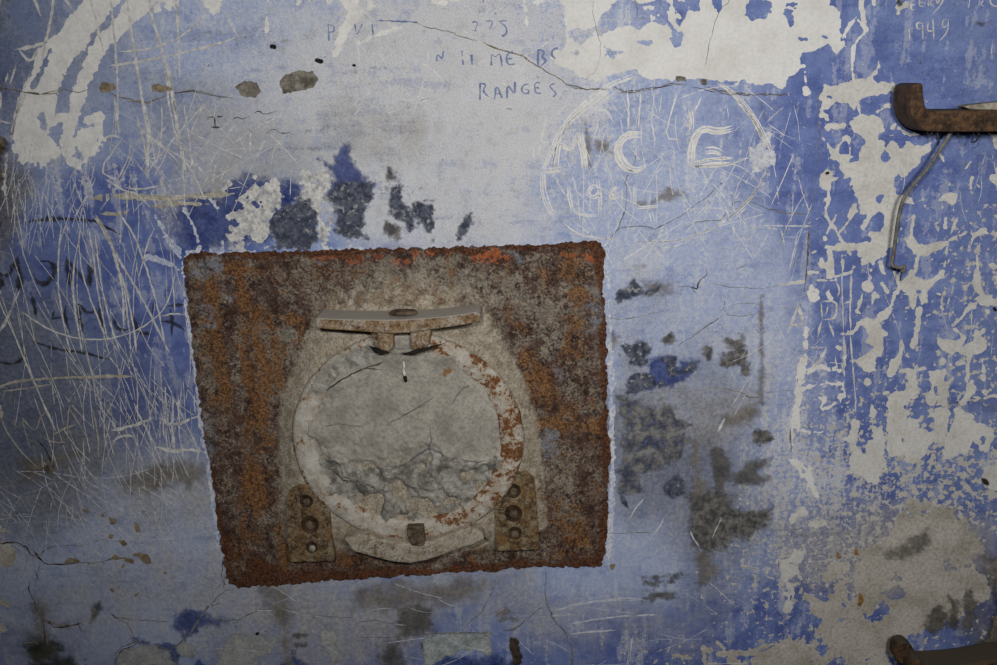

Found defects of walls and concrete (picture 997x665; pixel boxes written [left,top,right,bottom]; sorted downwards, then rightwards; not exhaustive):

crack [386,0,785,96]
leakage [615,279,659,303]
crack [611,90,821,345]
peeling [550,0,997,498]
peeling [206,461,220,548]
spalling [318,450,502,521]
leakage [613,338,755,507]
leakage [664,447,773,551]
leakage [752,430,774,443]
crack [0,539,268,665]
peeling [672,499,992,665]
leakage [924,590,977,634]